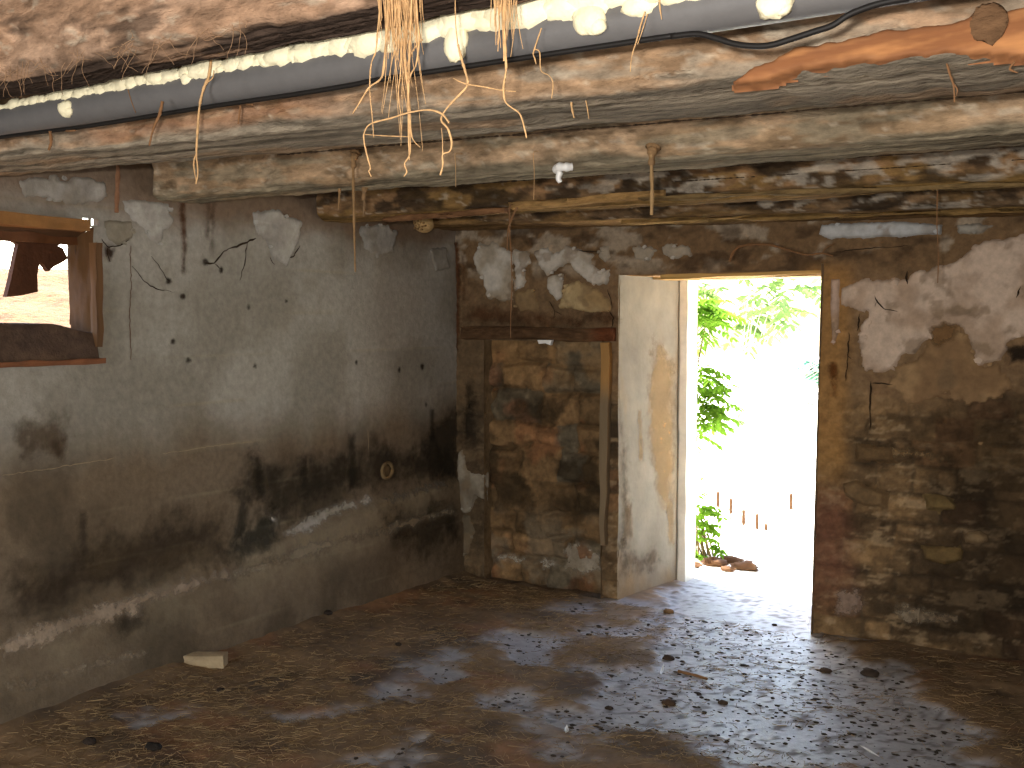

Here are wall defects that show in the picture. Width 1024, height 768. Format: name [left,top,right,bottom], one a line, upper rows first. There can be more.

peeling [19,174,107,205]
crack [102,240,171,348]
peeling [104,200,174,259]
crack [207,238,300,279]
peeling [253,209,302,266]
peeling [359,224,398,258]
flaking render [473,241,611,313]
flaking render [830,223,1024,372]
crack [845,297,895,428]
leakage [4,404,476,652]
flaking render [457,450,489,556]